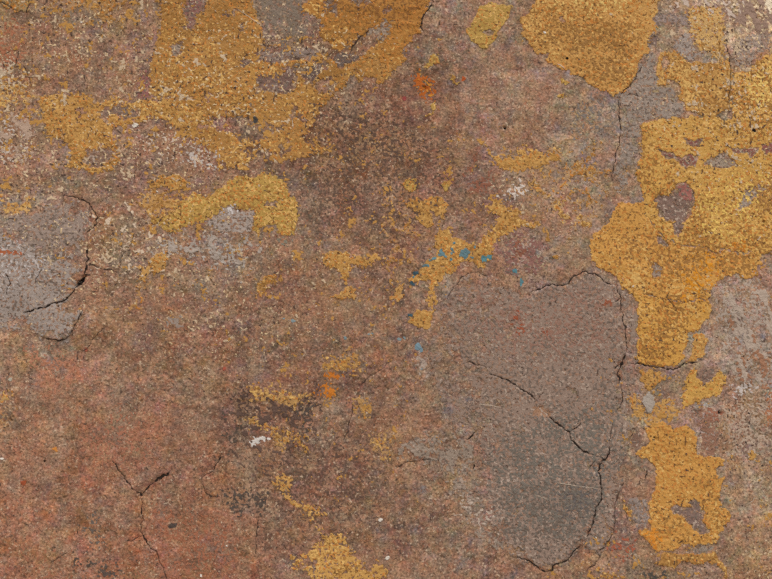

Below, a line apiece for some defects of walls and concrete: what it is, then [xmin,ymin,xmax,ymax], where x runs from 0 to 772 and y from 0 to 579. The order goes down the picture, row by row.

crack [22,196,135,342]
crack [470,271,704,572]
crack [112,461,169,579]